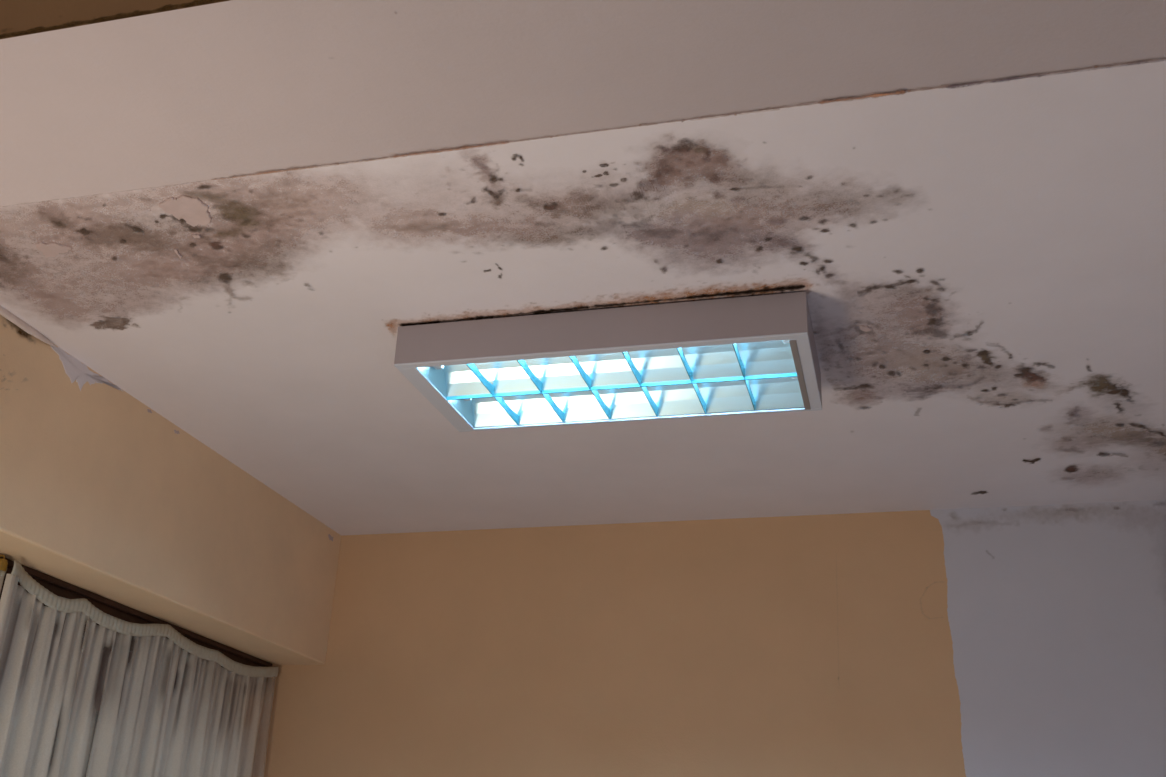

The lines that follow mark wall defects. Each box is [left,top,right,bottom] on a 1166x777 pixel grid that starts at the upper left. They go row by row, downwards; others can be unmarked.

water stain [0,178,351,330]
water stain [372,196,603,243]
water stain [482,167,520,205]
water stain [583,141,856,278]
water stain [820,269,1051,409]
water stain [1070,366,1166,455]